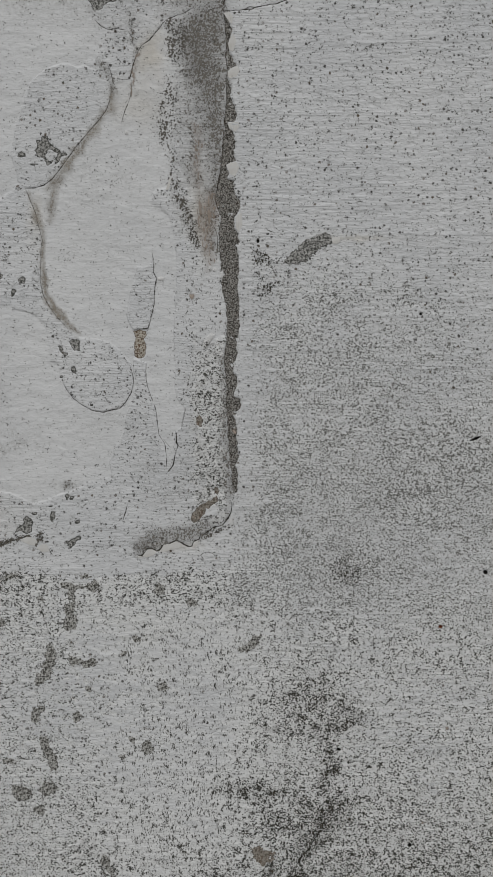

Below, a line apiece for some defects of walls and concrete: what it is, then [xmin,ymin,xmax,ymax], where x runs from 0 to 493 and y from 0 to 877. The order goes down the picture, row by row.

spalling [88,0,116,11]
leakage [150,0,231,256]
spalling [17,136,67,166]
crack [27,0,287,329]
spalling [216,12,242,493]
spalling [58,339,80,357]
spalling [133,329,147,358]
spalling [191,487,219,523]
spalling [15,512,49,552]
peeling [138,540,200,558]